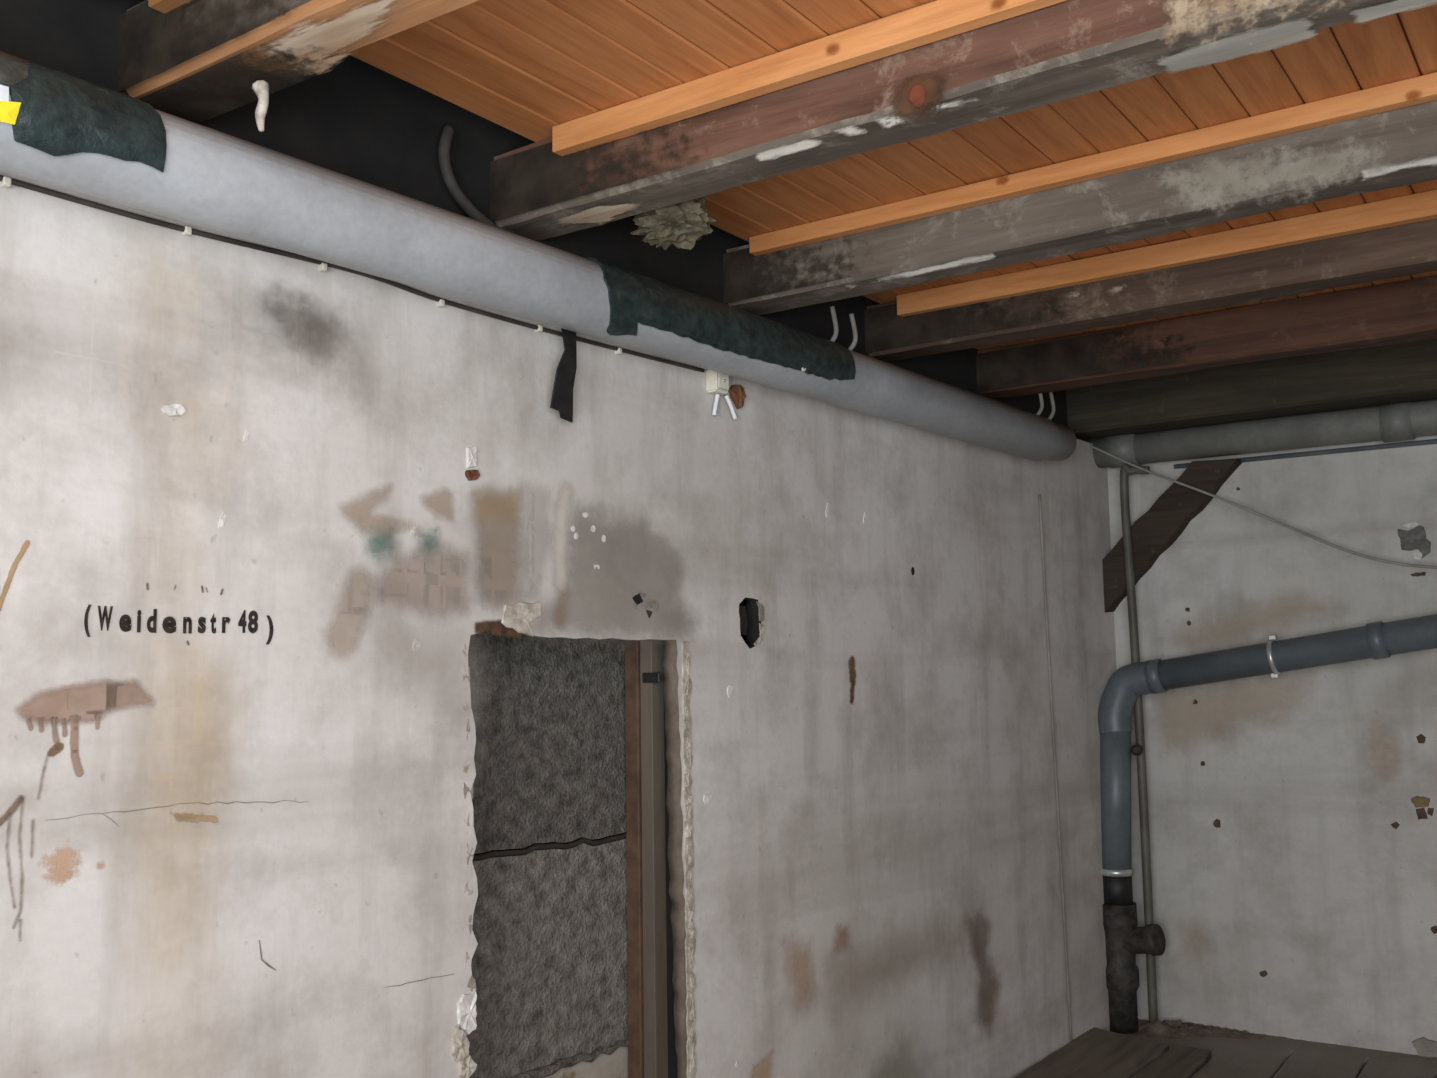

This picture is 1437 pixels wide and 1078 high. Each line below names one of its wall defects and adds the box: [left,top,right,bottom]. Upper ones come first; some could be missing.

flaking render [451,952,477,1078]